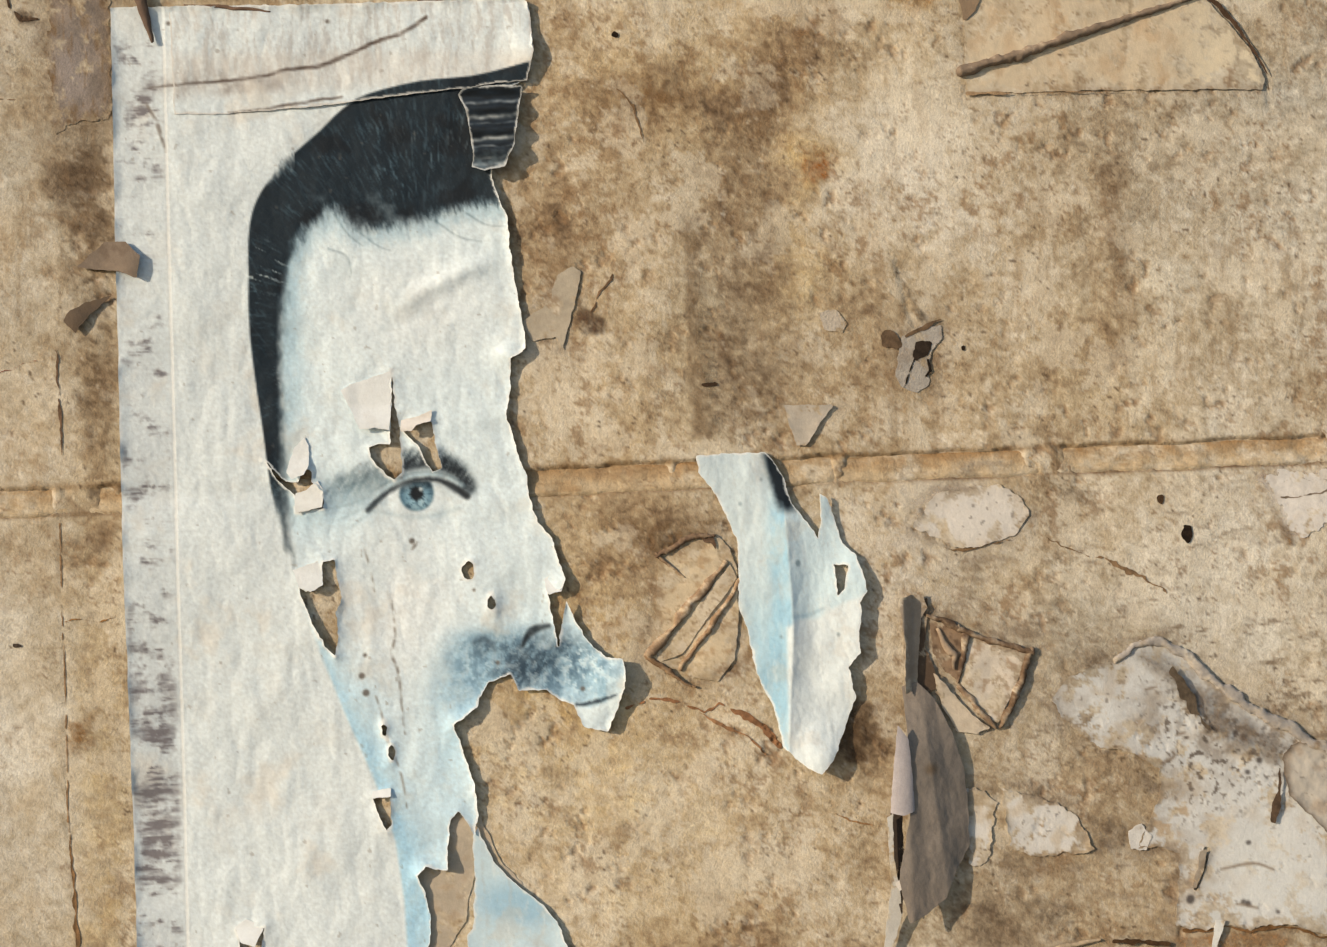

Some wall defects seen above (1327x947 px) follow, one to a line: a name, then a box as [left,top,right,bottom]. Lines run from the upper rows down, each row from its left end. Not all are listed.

peeling [912,484,1029,552]
peeling [1263,469,1327,545]
crack [59,523,111,947]
peeling [966,636,1327,947]